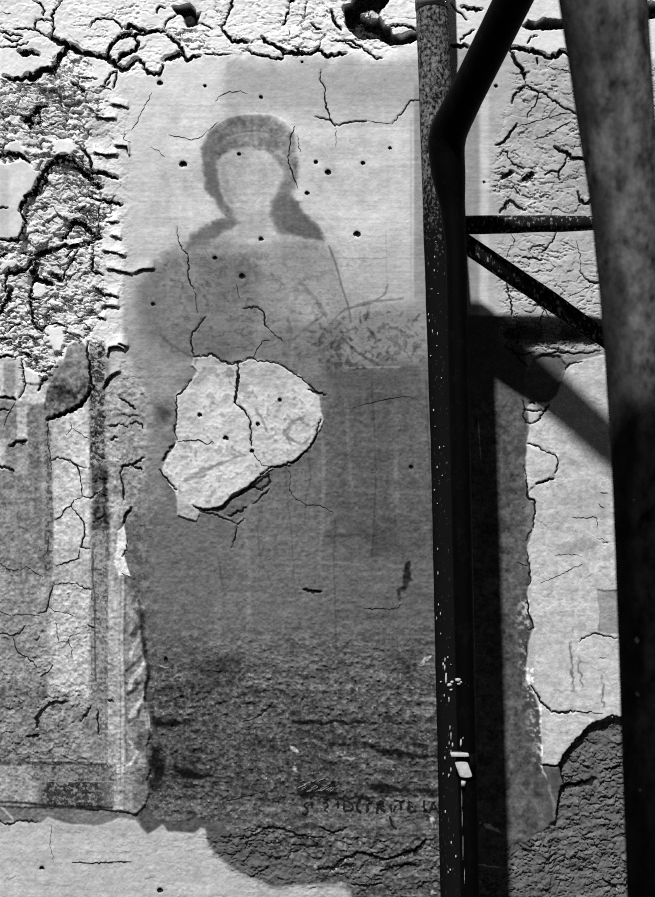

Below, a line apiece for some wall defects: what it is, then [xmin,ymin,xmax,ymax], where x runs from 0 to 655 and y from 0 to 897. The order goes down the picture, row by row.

crack [496,35,590,213]
crack [0,0,419,677]
crack [506,283,549,326]
crack [506,232,598,297]
peeling [162,355,325,523]
peeling [479,356,627,897]
crack [27,700,114,738]
crack [531,686,620,811]